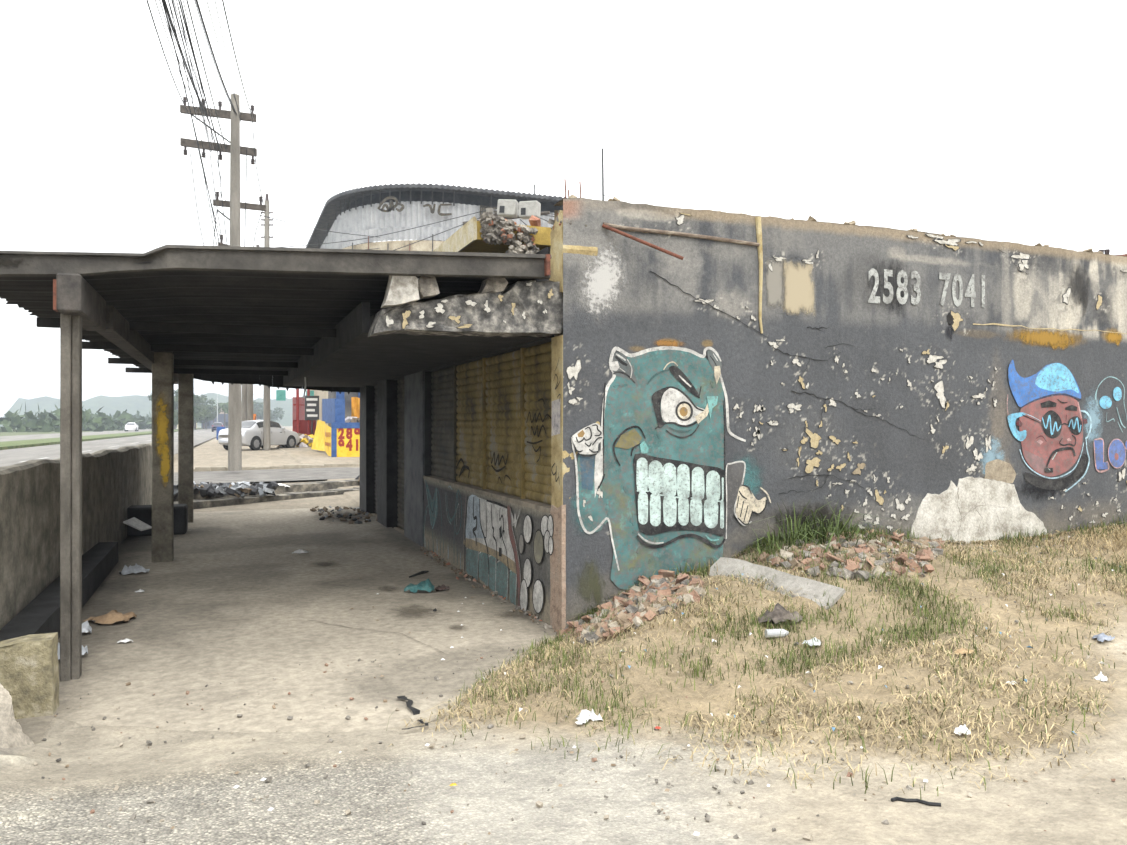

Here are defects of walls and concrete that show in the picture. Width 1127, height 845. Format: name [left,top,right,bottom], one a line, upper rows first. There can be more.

spalling [479,212,541,254]
peeling [766,250,819,314]
peeling [385,294,526,330]
spalling [947,309,964,332]
crack [650,271,924,440]
peeling [780,358,809,390]
peeling [899,349,997,434]
flaking render [733,397,1060,545]
peeling [1049,482,1121,530]